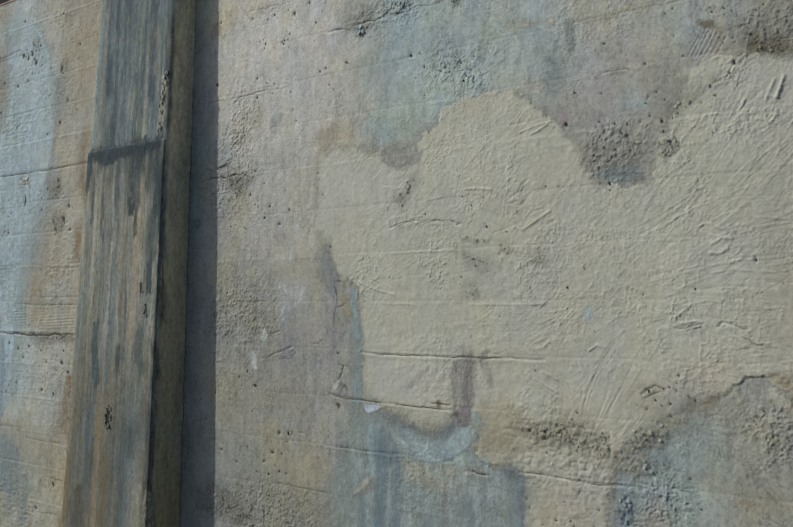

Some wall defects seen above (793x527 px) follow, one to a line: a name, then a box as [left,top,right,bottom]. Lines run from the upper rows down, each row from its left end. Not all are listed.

damp [86,134,164,319]
crack [1,330,74,338]
damp [91,319,99,387]
crack [180,136,252,491]
damp [142,404,156,527]
damp [335,405,528,527]